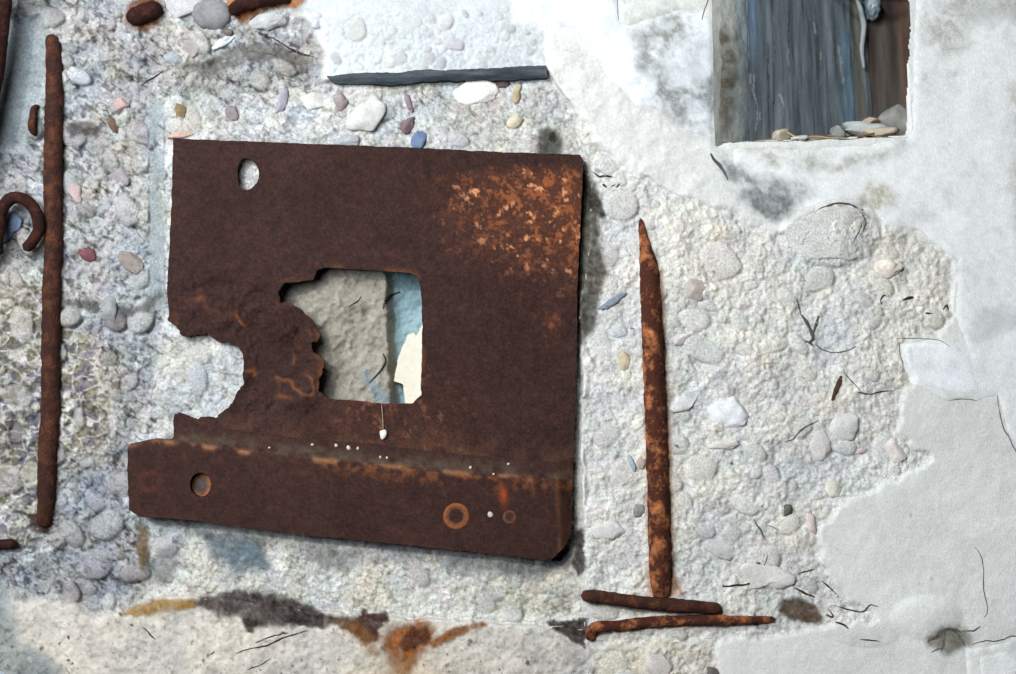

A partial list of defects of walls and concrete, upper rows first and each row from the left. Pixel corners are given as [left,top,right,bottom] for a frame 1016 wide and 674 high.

rust [236,0,304,21]
peeling [512,0,714,134]
spalling [0,0,592,627]
spalling [569,0,1016,674]
crack [953,396,1016,451]
damp [243,619,257,632]
damp [289,614,324,628]
rust [341,609,486,674]